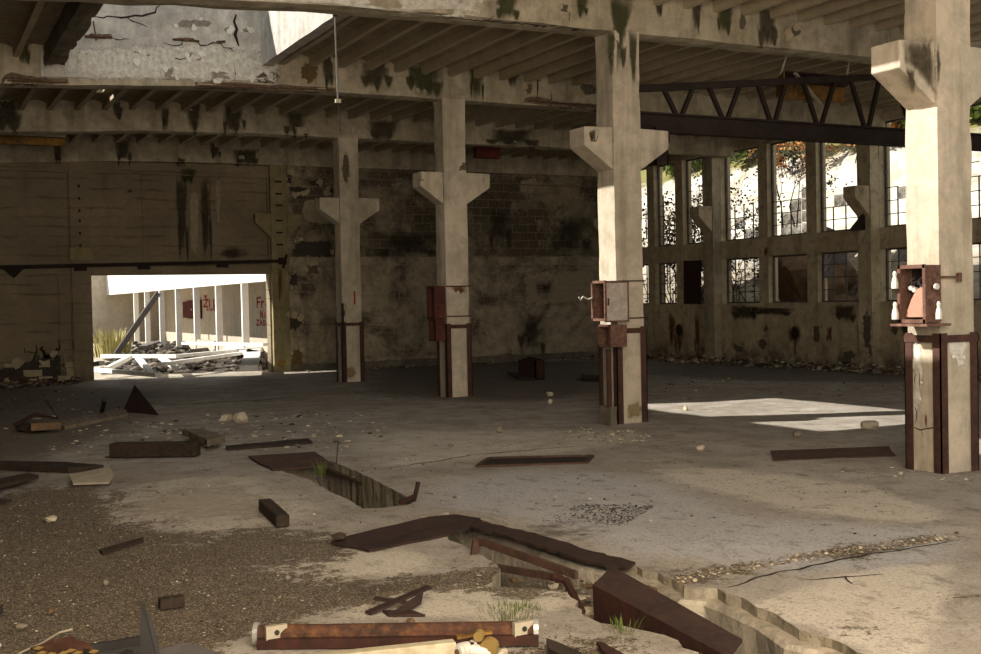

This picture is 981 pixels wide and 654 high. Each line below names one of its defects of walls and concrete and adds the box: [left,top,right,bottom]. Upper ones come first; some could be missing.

spalling [84,21,113,41]
crack [95,5,160,40]
peeling [172,17,211,63]
crack [165,14,239,80]
leakage [608,32,637,77]
leakage [717,8,732,35]
leakage [759,10,778,47]
leakage [406,67,443,96]
leakage [176,158,240,260]
flaking render [286,237,334,290]
flaking render [0,351,74,383]
crack [729,540,959,587]